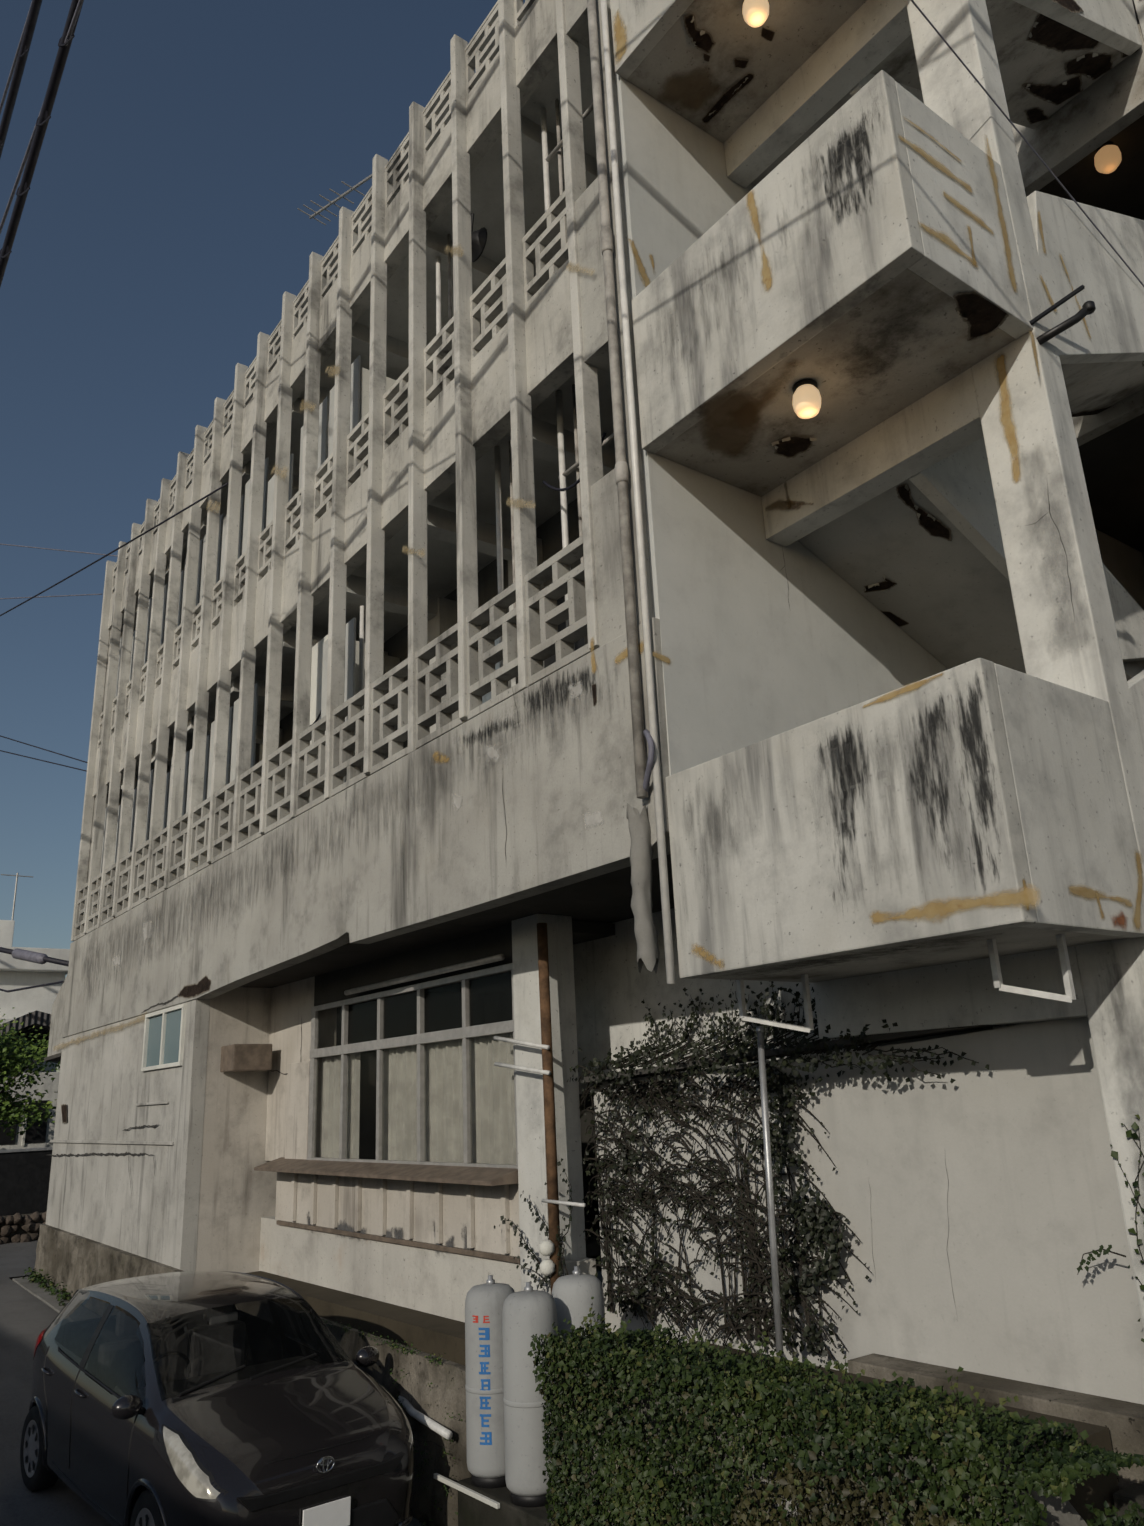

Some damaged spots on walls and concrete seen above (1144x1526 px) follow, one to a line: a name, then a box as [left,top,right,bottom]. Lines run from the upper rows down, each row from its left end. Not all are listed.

spalling [702,58,754,124]
spalling [761,27,775,42]
spalling [1022,0,1139,124]
damp [821,114,880,224]
spalling [953,292,1009,341]
damp [704,390,774,456]
spalling [771,435,817,458]
spalling [896,484,952,541]
damp [524,640,596,715]
damp [820,727,882,865]
damp [871,680,1038,923]
damp [1069,852,1142,929]